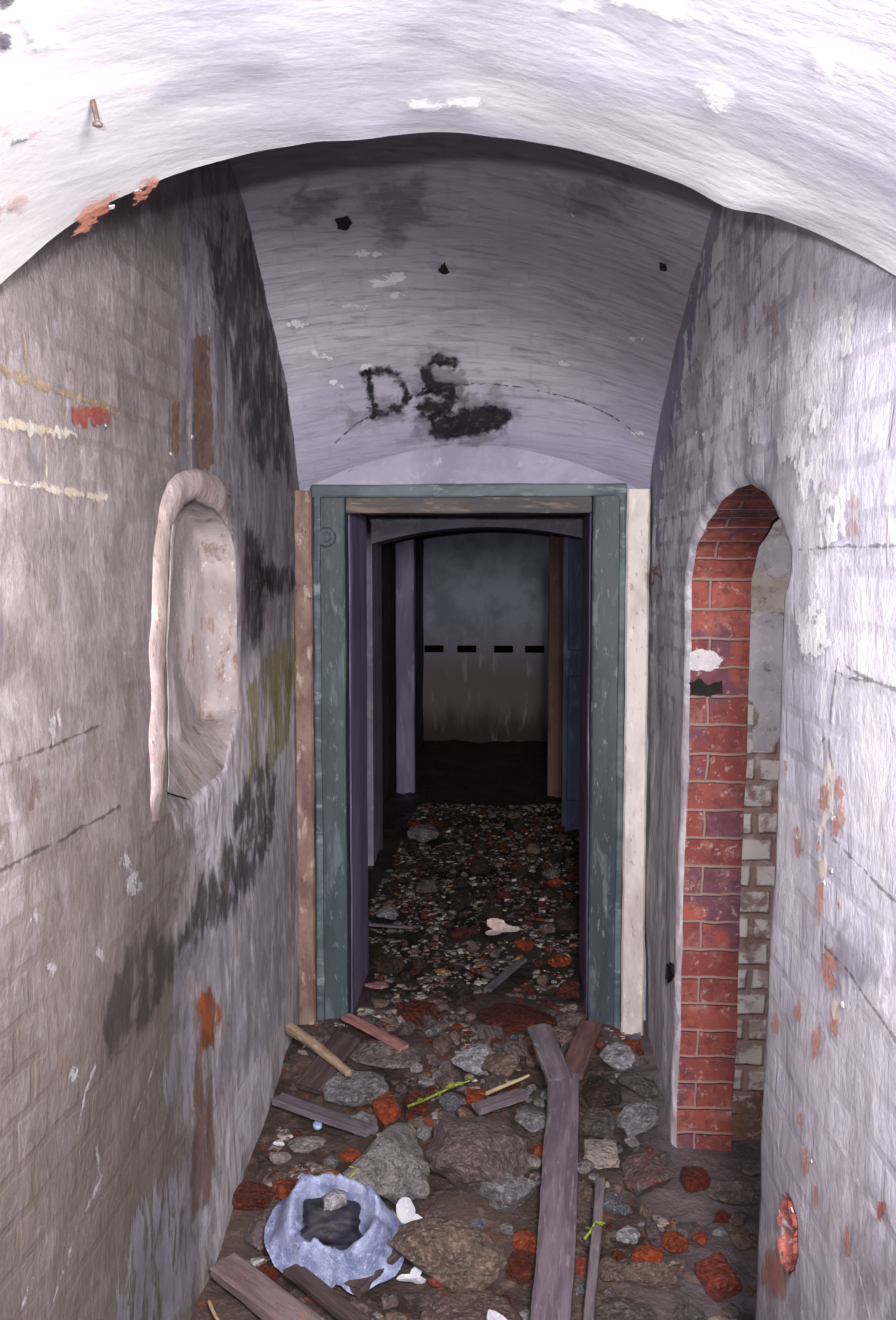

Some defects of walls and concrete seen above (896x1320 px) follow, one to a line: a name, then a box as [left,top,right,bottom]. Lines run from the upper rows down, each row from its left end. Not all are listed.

peeling [0,32,12,50]
peeling [72,193,118,236]
peeling [134,177,159,205]
crack [799,542,895,550]
crack [0,725,98,765]
spalling [689,678,723,697]
crack [821,659,896,767]
crack [0,805,120,872]
spalling [793,762,845,925]
crack [833,838,896,903]
spalling [811,946,844,1059]
spalling [776,1195,798,1272]